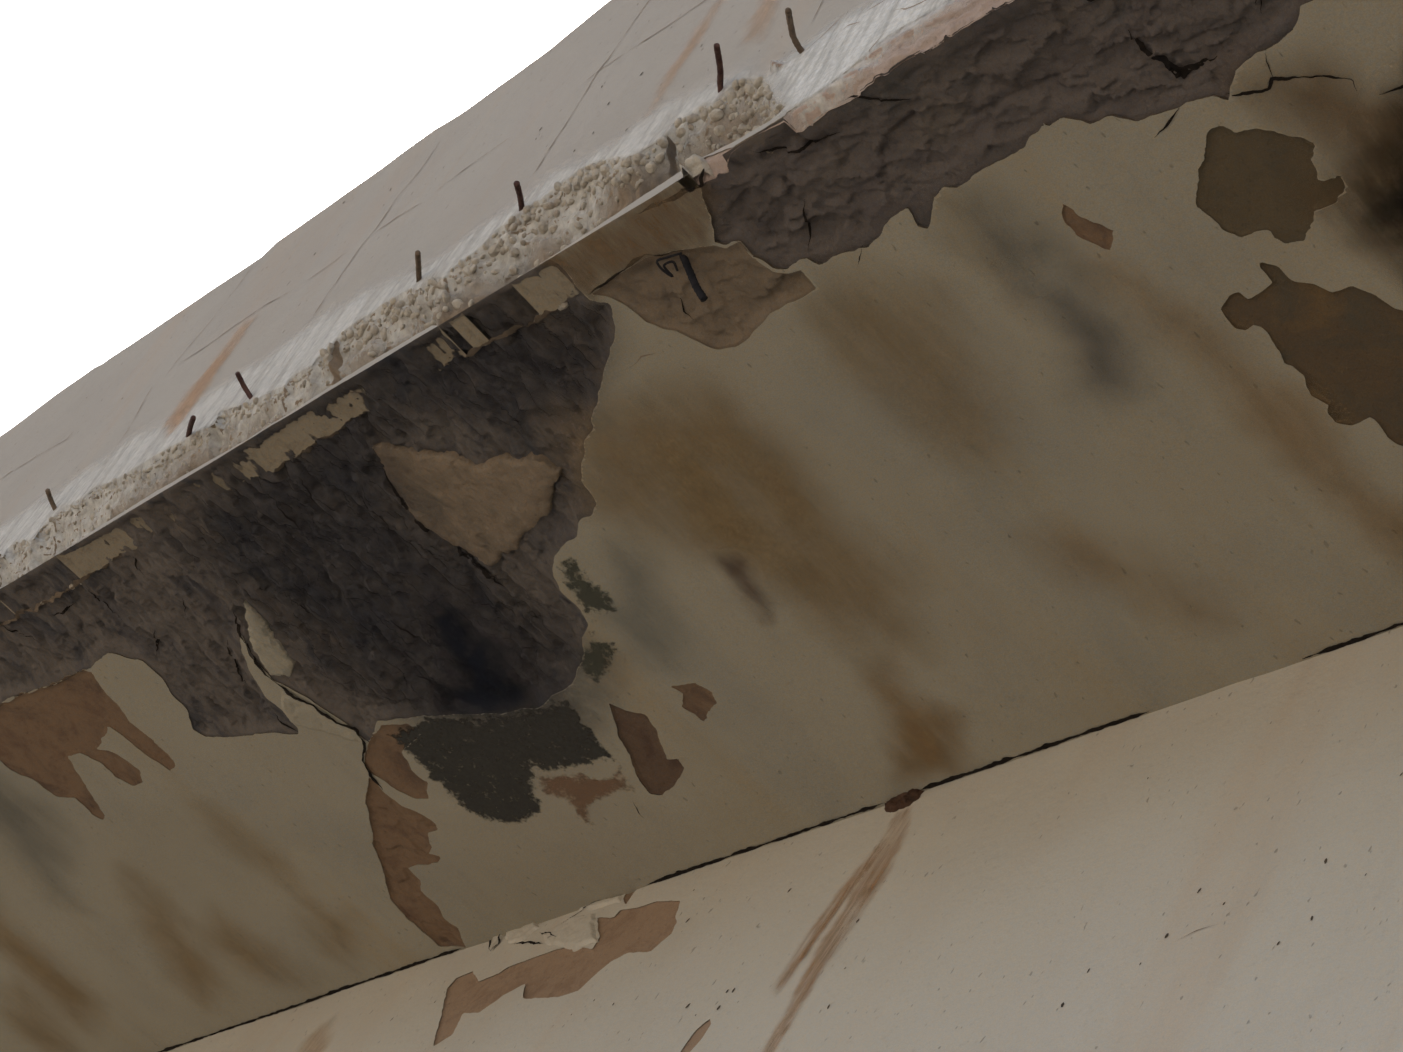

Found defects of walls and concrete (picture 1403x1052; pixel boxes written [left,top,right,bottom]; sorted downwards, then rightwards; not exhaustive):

crack [1154,108,1179,138]
flaking render [1196,126,1345,243]
crack [1228,54,1403,96]
leakage [1300,85,1403,245]
spalling [0,0,1313,820]
flaking render [1221,262,1403,446]
flaking render [365,778,466,948]
flaking render [434,892,690,1046]